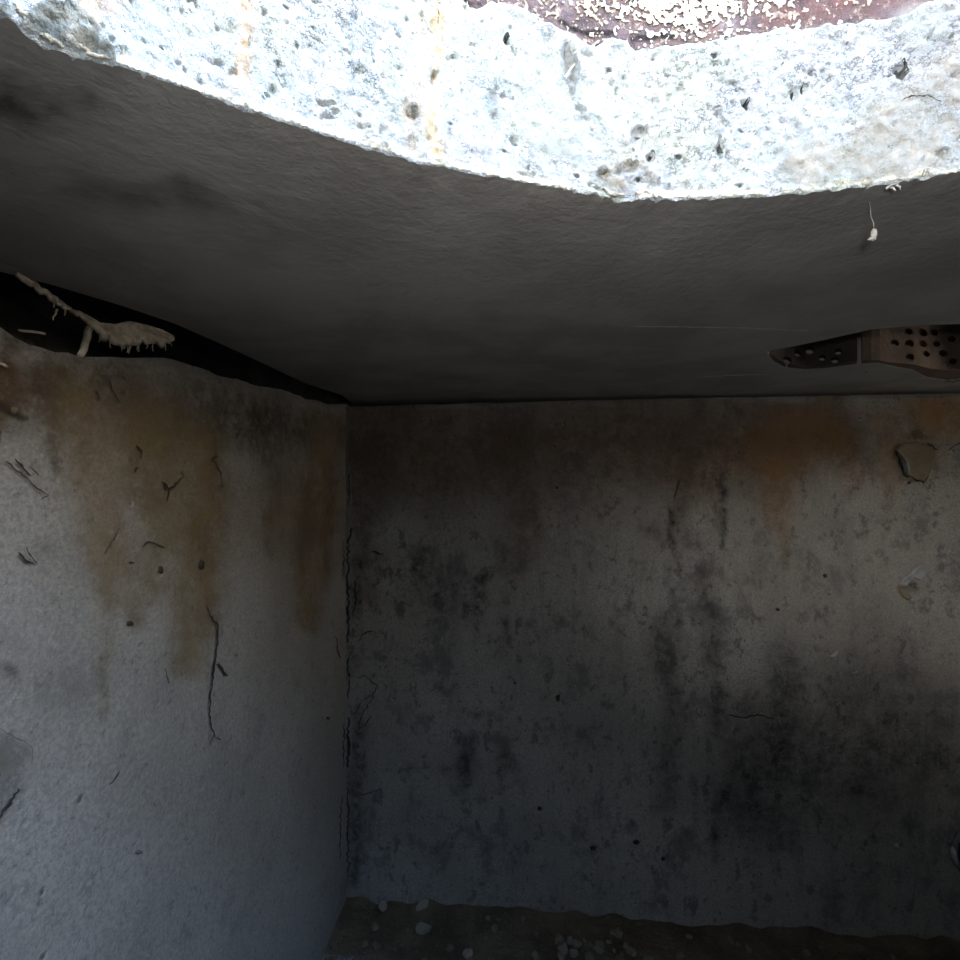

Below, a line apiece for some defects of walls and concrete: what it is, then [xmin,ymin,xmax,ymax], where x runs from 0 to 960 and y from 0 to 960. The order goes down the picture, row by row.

spalling [0,0,116,60]
rust [558,19,614,36]
peeling [487,0,878,49]
spalling [894,58,912,80]
crack [901,94,941,102]
spalling [597,149,657,198]
crack [206,604,228,746]
crack [335,451,383,873]